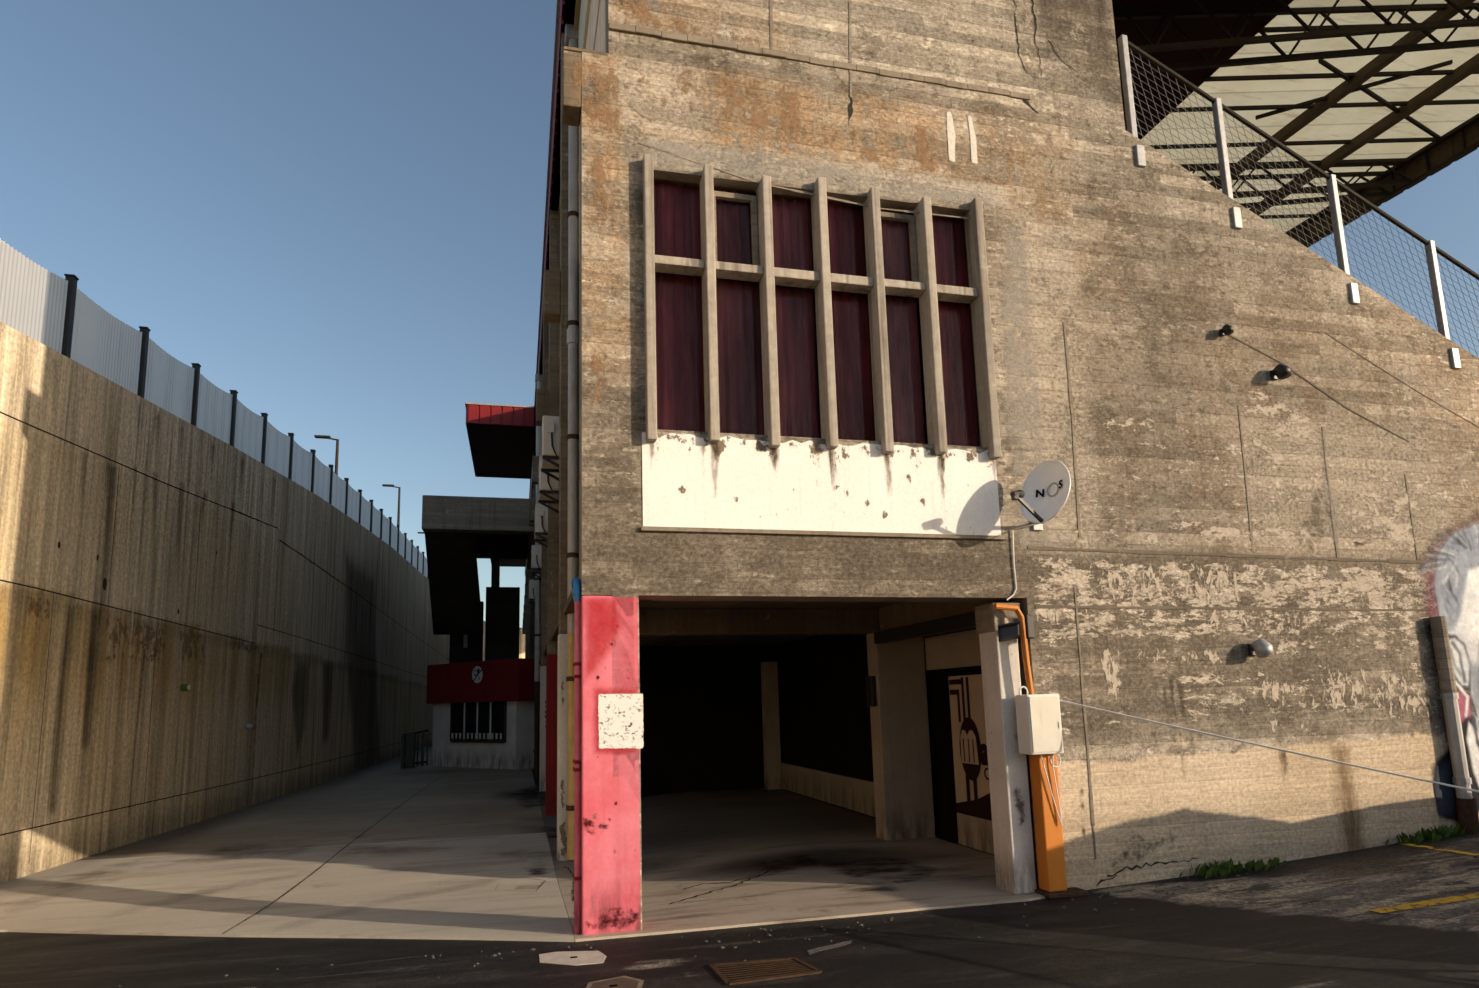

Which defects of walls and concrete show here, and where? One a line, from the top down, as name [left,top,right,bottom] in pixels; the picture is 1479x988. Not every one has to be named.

crack [1013,0,1080,114]
peeling [657,434,990,482]
peeling [1087,414,1190,433]
peeling [1240,389,1319,469]
peeling [1075,498,1319,549]
peeling [1341,482,1423,553]
peeling [1088,563,1434,734]
leakage [52,613,70,808]